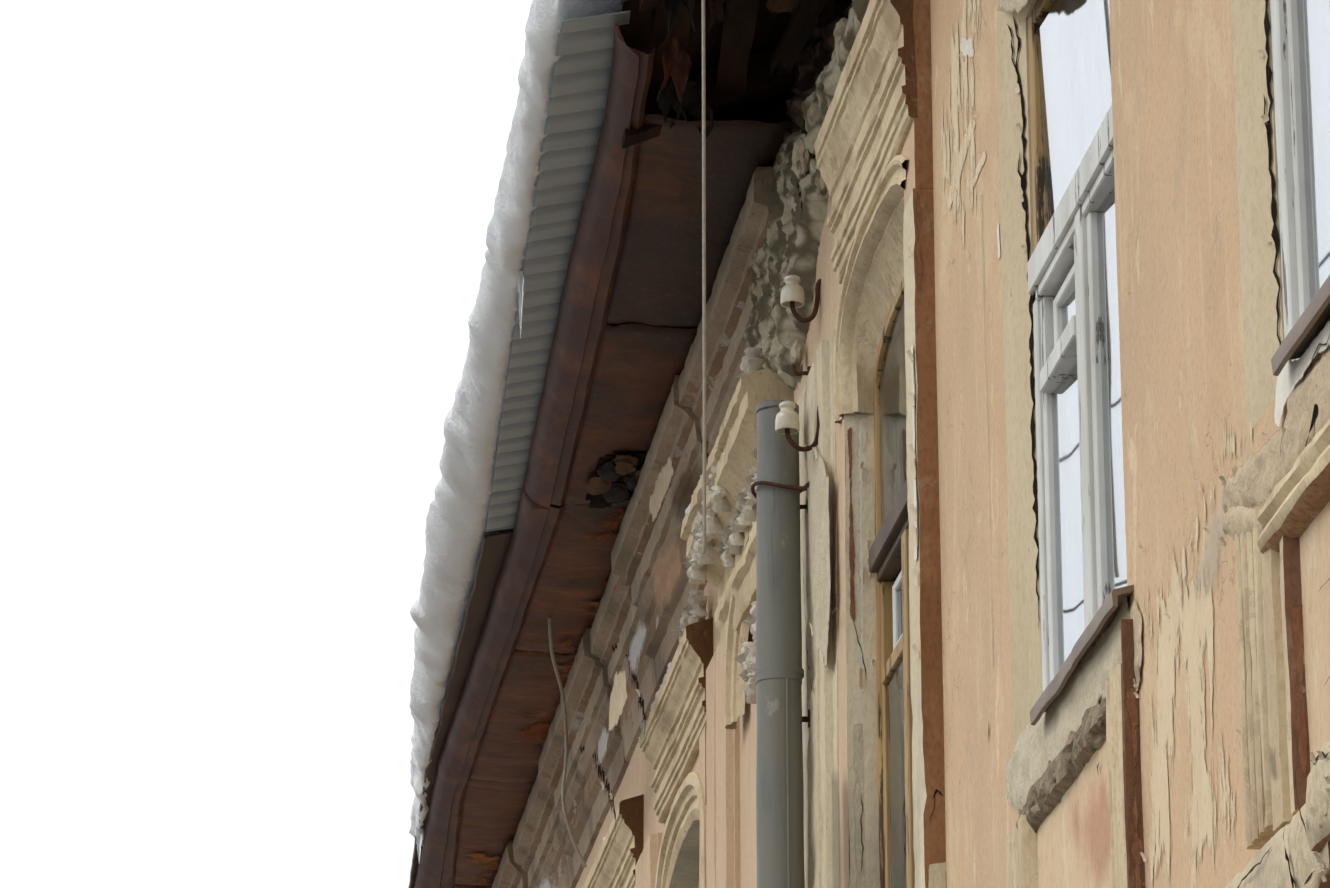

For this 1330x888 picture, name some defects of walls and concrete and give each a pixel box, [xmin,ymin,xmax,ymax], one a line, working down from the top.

spalling [743,0,870,391]
peeling [941,0,986,263]
flaking render [999,0,1028,13]
crack [1007,12,1040,628]
crack [1258,0,1281,345]
crack [1280,334,1330,454]
peeling [1005,345,1330,888]
crack [1237,746,1330,888]